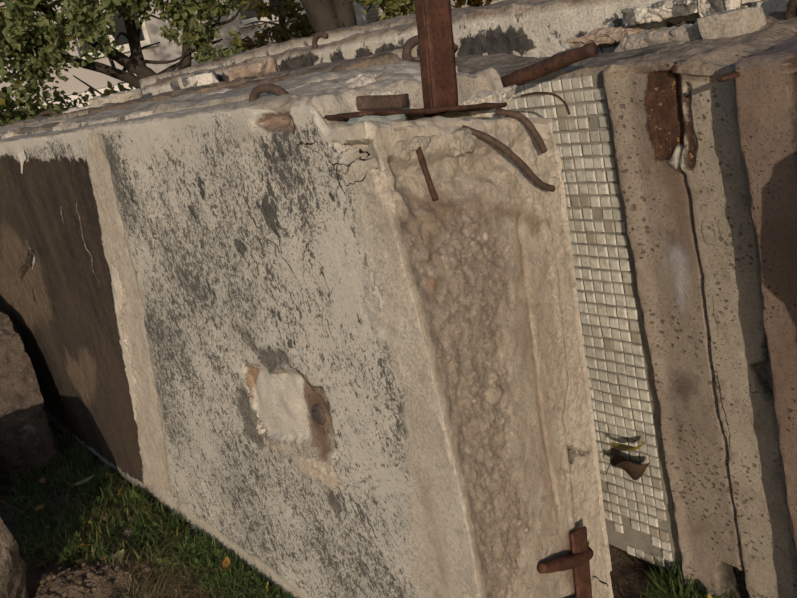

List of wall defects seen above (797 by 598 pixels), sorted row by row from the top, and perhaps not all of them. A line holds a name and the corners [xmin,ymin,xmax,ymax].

rust [500,42,599,88]
peeling [256,112,298,237]
spalling [415,146,439,201]
spalling [461,125,555,192]
spalling [495,108,547,153]
spalling [234,328,341,513]